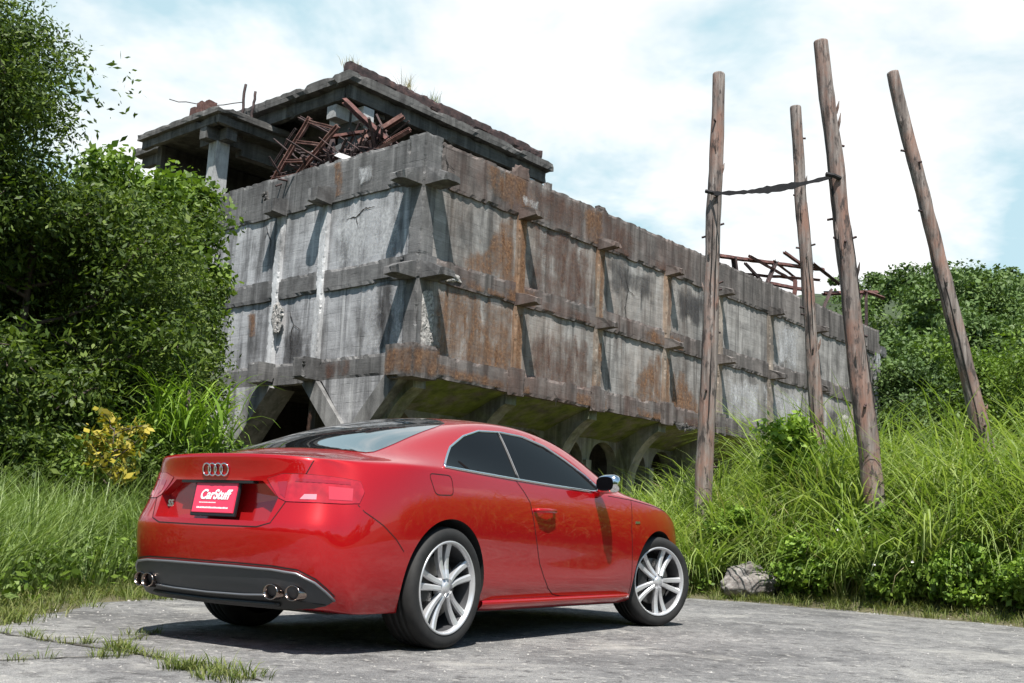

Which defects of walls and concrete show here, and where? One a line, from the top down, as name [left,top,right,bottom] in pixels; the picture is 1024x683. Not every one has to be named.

corrosion [468,220,536,301]
corrosion [386,287,522,385]